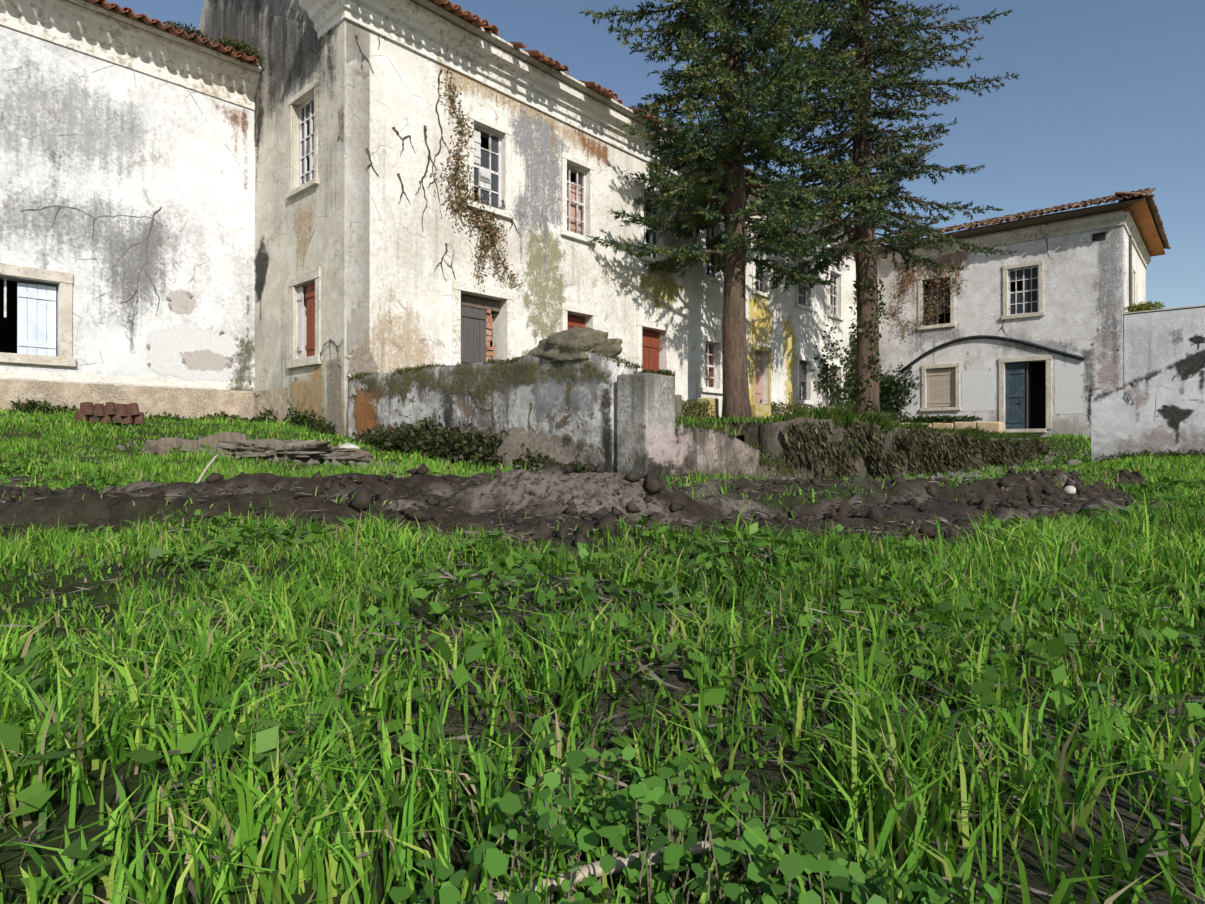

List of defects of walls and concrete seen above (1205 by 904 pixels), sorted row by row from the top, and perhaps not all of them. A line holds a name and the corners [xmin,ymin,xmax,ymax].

leakage [203,0,336,187]
leakage [0,200,175,304]
peeling [145,323,247,382]
leakage [230,236,269,391]
spalling [277,348,380,436]
leakage [1003,340,1095,417]
leakage [1093,227,1126,361]